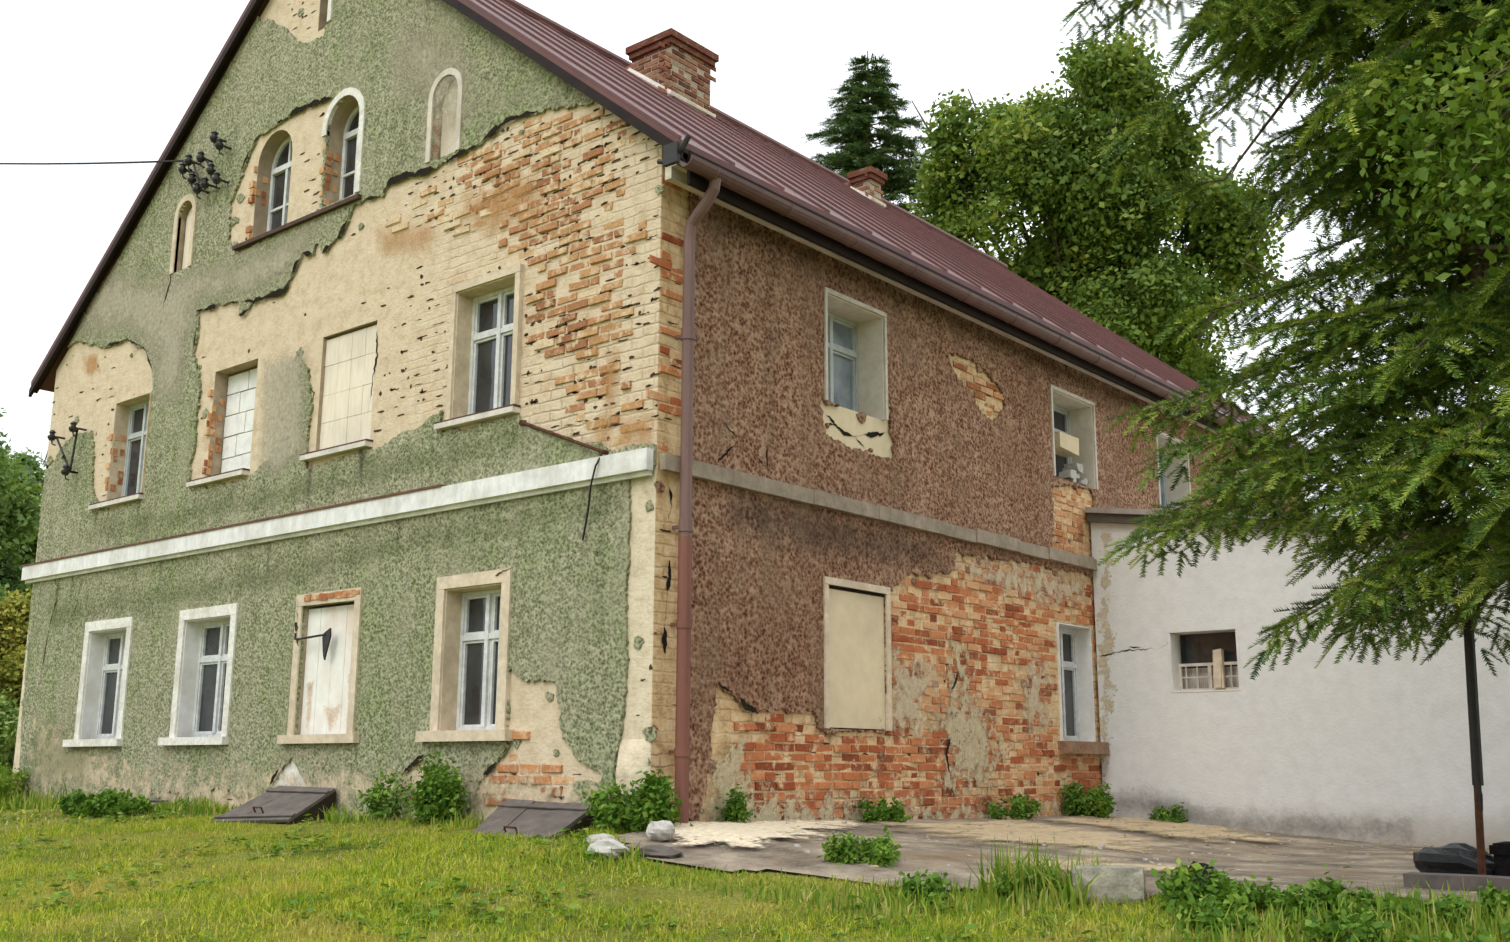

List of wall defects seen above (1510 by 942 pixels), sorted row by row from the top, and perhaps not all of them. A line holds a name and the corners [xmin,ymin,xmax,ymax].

flaking render [260,0,325,43]
peeling [46,339,153,510]
flaking render [191,98,689,821]
peeling [820,400,892,459]
peeling [13,626,29,779]
flaking render [699,486,1103,822]